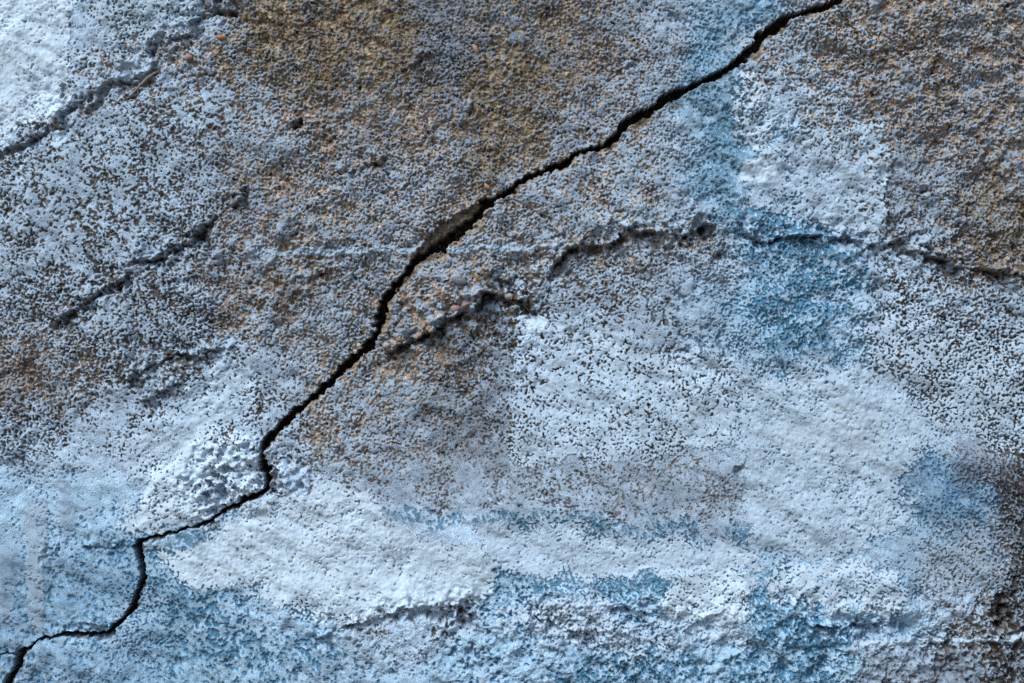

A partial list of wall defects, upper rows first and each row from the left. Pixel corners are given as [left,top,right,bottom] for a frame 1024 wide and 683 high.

crack [832,5,863,57]
crack [47,215,217,336]
crack [269,485,283,496]
crack [0,645,32,658]